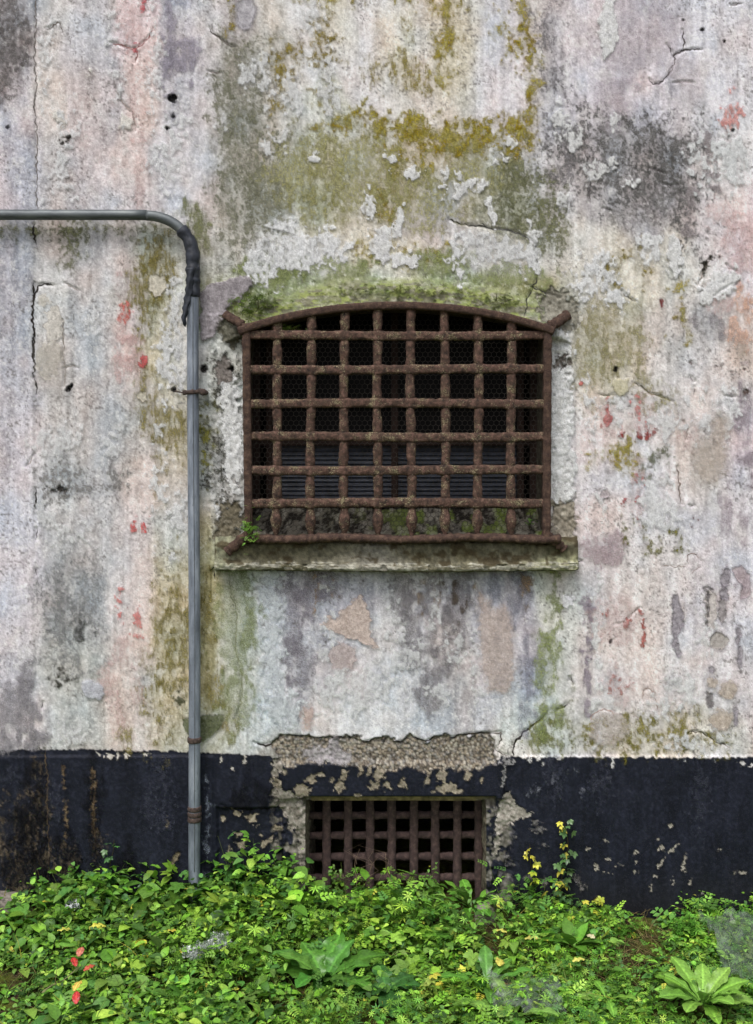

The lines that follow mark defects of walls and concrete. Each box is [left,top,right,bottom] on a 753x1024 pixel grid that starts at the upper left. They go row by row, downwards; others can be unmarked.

crack [649,32,702,85]
crack [32,1,63,243]
peeling [382,153,426,180]
peeling [492,135,518,165]
peeling [438,166,542,289]
crack [449,219,546,315]
crack [30,283,78,392]
flaking render [258,571,559,877]
peeling [202,797,258,854]